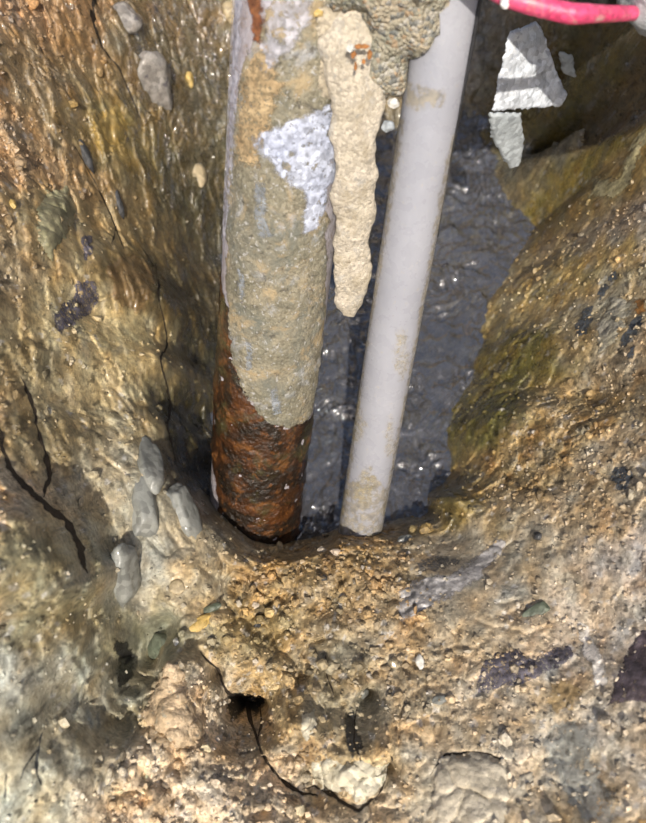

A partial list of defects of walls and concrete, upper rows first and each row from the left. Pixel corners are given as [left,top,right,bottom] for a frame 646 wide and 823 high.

crack [90,0,143,124]
rust [247,0,266,45]
peeling [254,105,336,233]
crack [0,377,88,574]
rust [210,269,314,544]
crack [201,653,393,812]